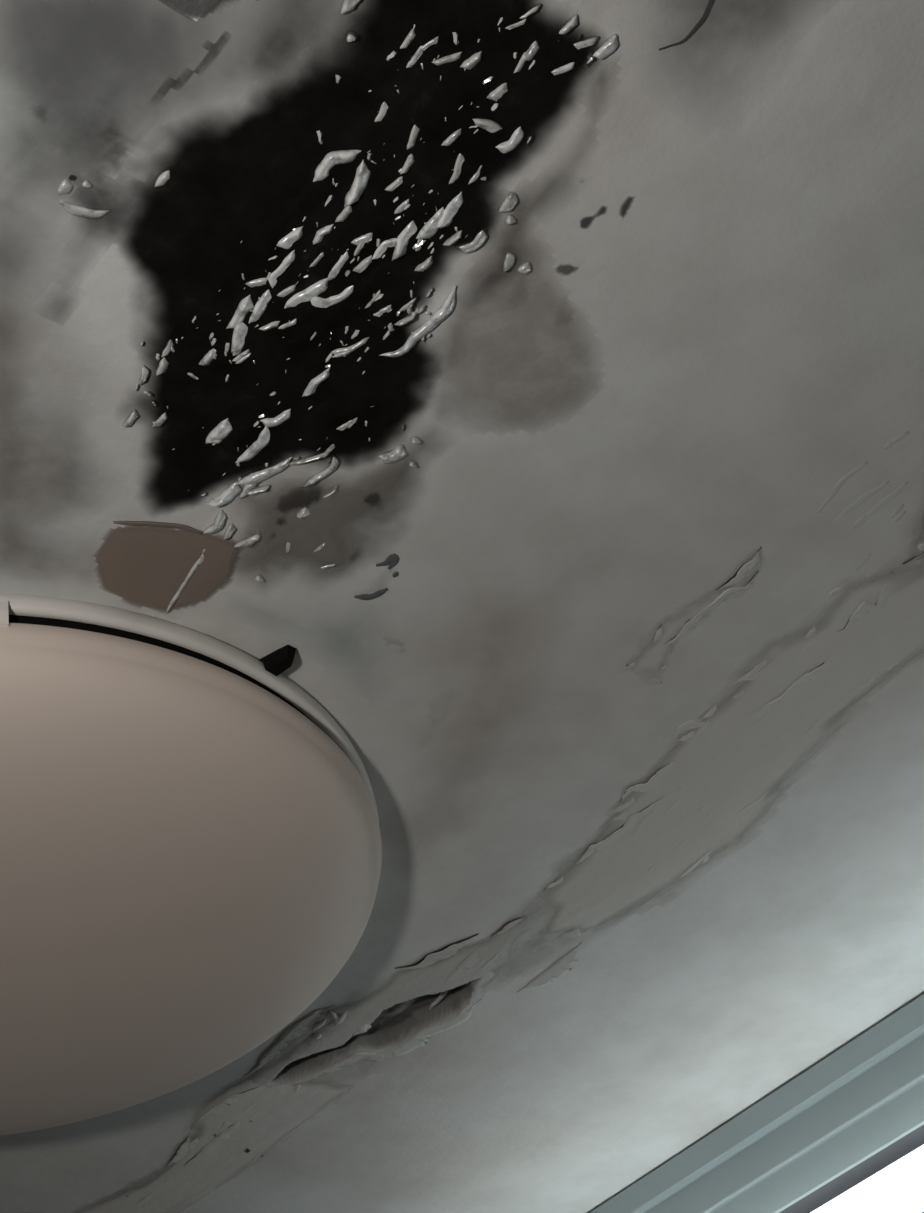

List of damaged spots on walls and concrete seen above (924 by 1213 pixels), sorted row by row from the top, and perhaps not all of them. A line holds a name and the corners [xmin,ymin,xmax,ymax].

peeling [340,0,362,14]
peeling [155,171,170,187]
water stain [57,179,110,219]
peeling [498,192,519,225]
peeling [459,230,488,253]
mould [122,0,618,548]
peeling [501,252,532,275]
peeling [557,265,575,274]
peeling [95,436,422,613]
water stain [354,553,399,600]
flaking render [245,916,527,1091]